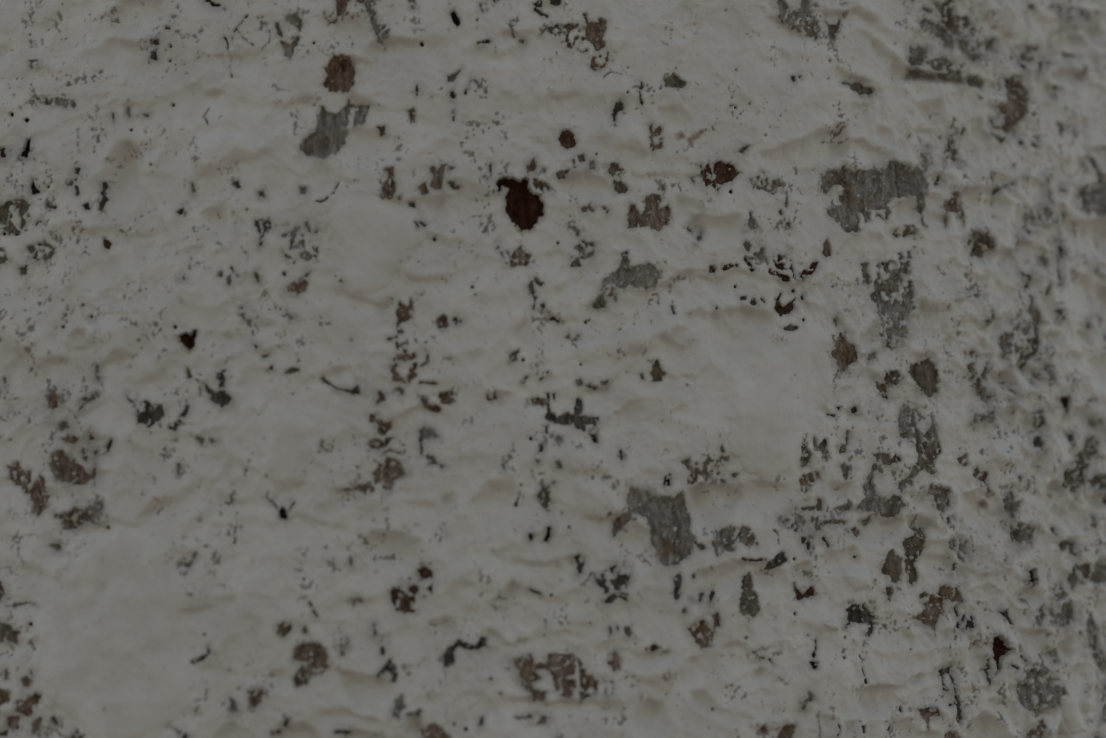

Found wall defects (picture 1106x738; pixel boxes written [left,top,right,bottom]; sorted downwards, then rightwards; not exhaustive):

peeling [908,0,995,78]
peeling [300,55,370,159]
peeling [0,181,57,235]
spalling [486,130,595,230]
peeling [627,184,671,231]
peeling [691,161,790,227]
peeling [821,157,939,238]
peeling [831,251,915,372]
peeling [780,407,952,550]
peeling [612,446,787,617]
peeling [443,637,486,667]
peeling [513,652,620,702]